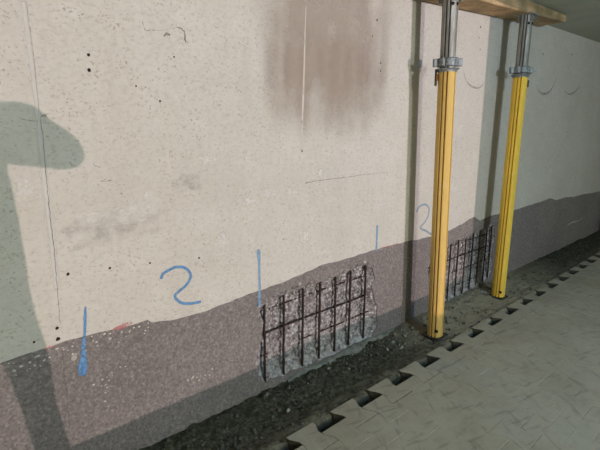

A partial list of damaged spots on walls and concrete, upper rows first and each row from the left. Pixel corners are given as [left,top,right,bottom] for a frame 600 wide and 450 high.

water stain [285,3,369,149]
spalling [444,214,499,302]
peeling [507,191,600,273]
peeling [0,237,431,450]